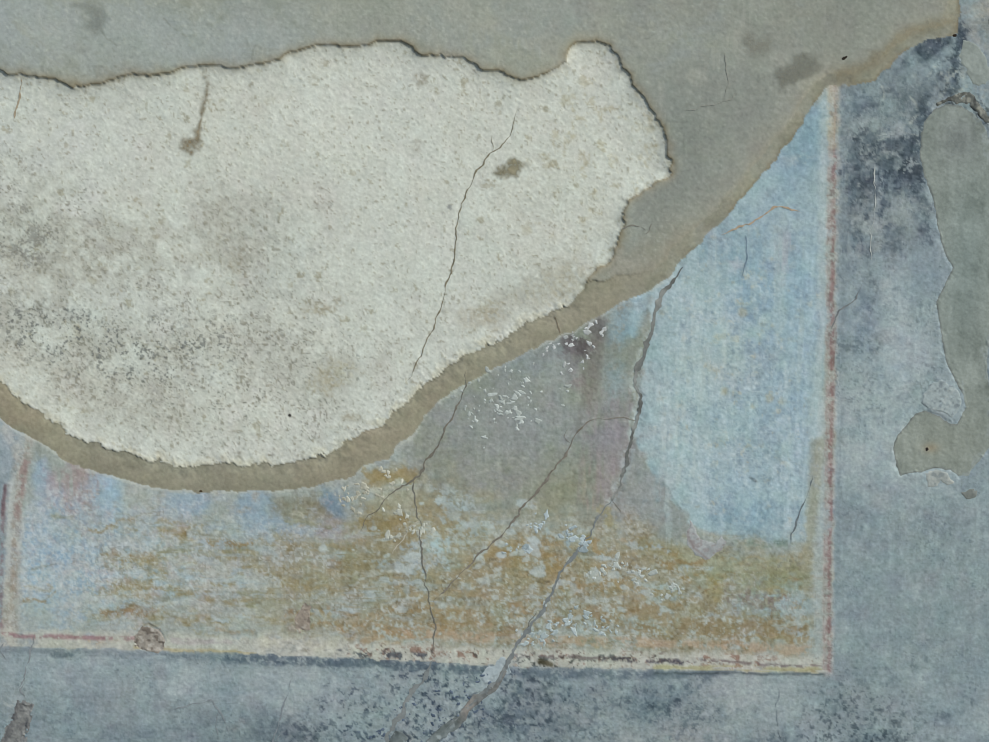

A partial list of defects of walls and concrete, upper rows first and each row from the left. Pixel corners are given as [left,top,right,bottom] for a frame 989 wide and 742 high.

spalling [936,92,989,123]
crack [406,118,515,382]
peeling [532,320,606,392]
peeling [451,366,542,431]
crack [362,267,683,742]
peeling [558,524,592,553]
spalling [1,700,34,742]